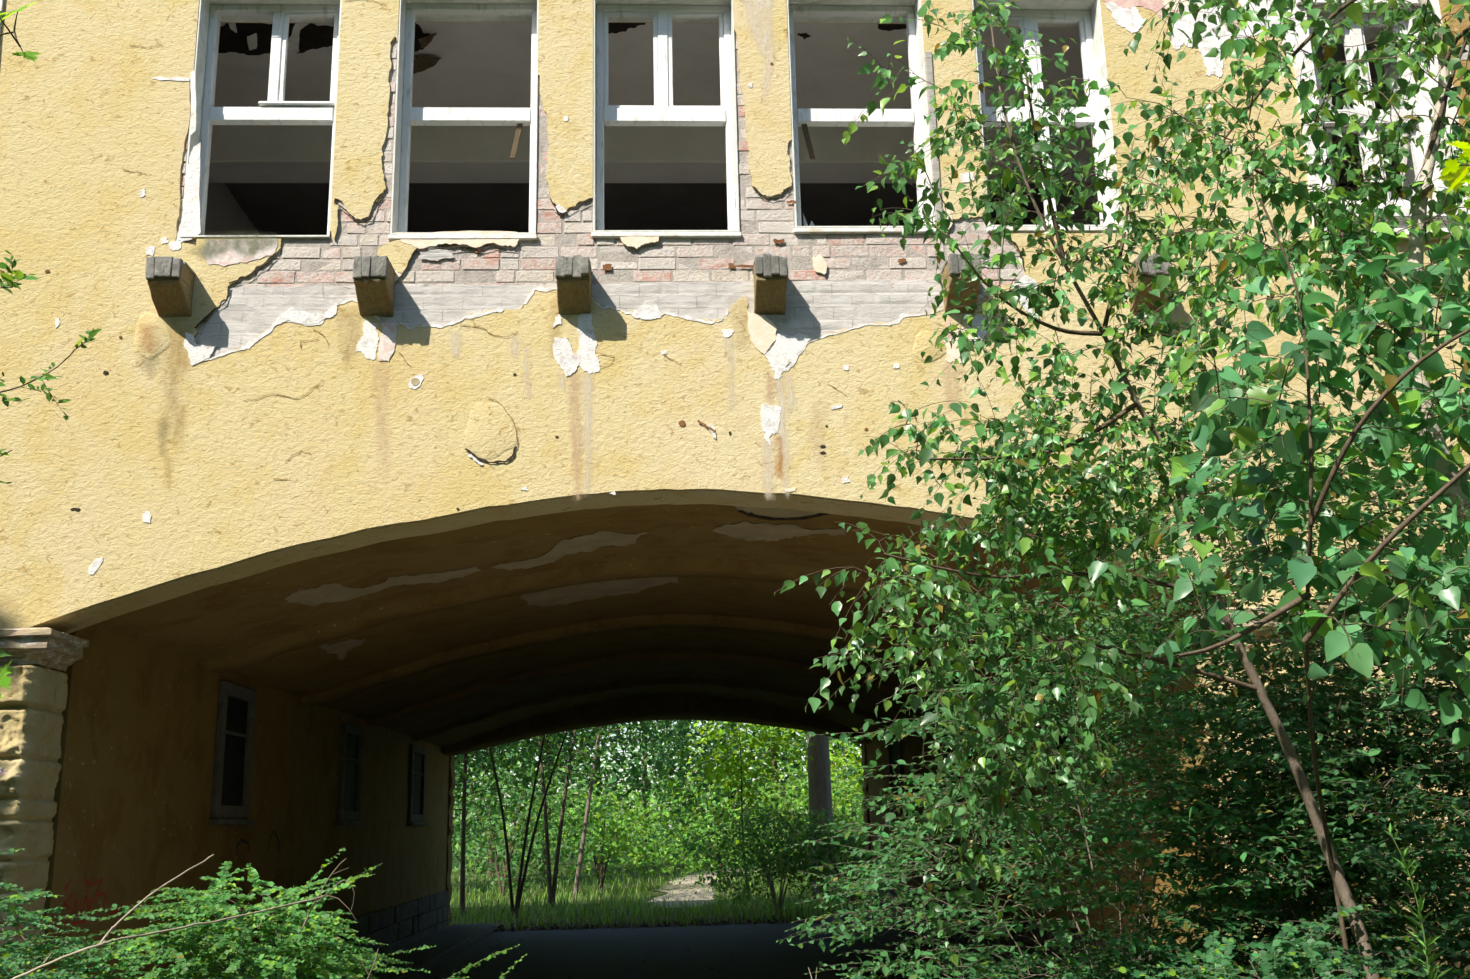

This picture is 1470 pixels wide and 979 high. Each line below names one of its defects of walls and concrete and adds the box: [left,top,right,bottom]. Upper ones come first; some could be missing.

spalling [146,31,1037,380]
peeling [1102,0,1292,77]